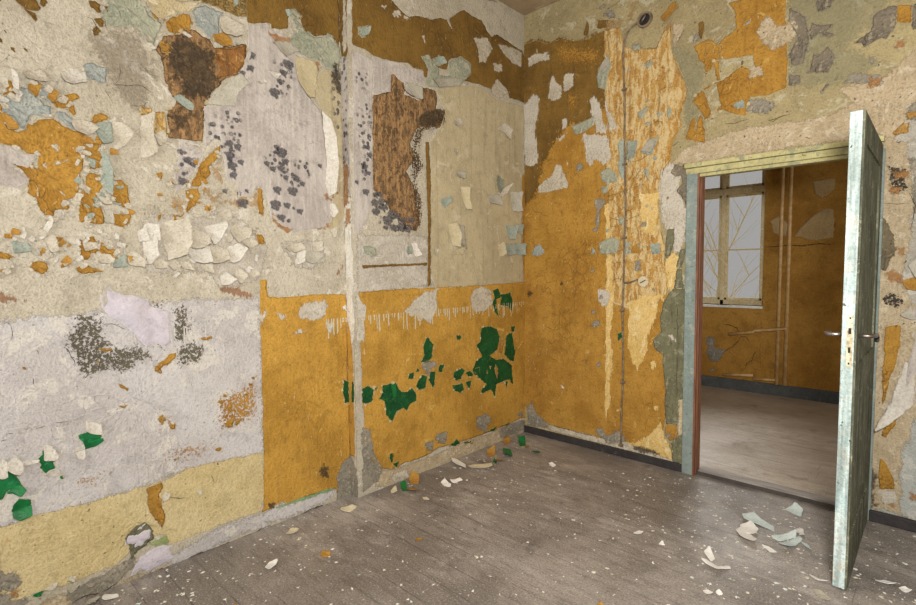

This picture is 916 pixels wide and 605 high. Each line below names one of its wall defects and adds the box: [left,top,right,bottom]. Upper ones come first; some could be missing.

peeling [56,62,108,84]
peeling [0,69,358,605]
peeling [88,0,916,516]